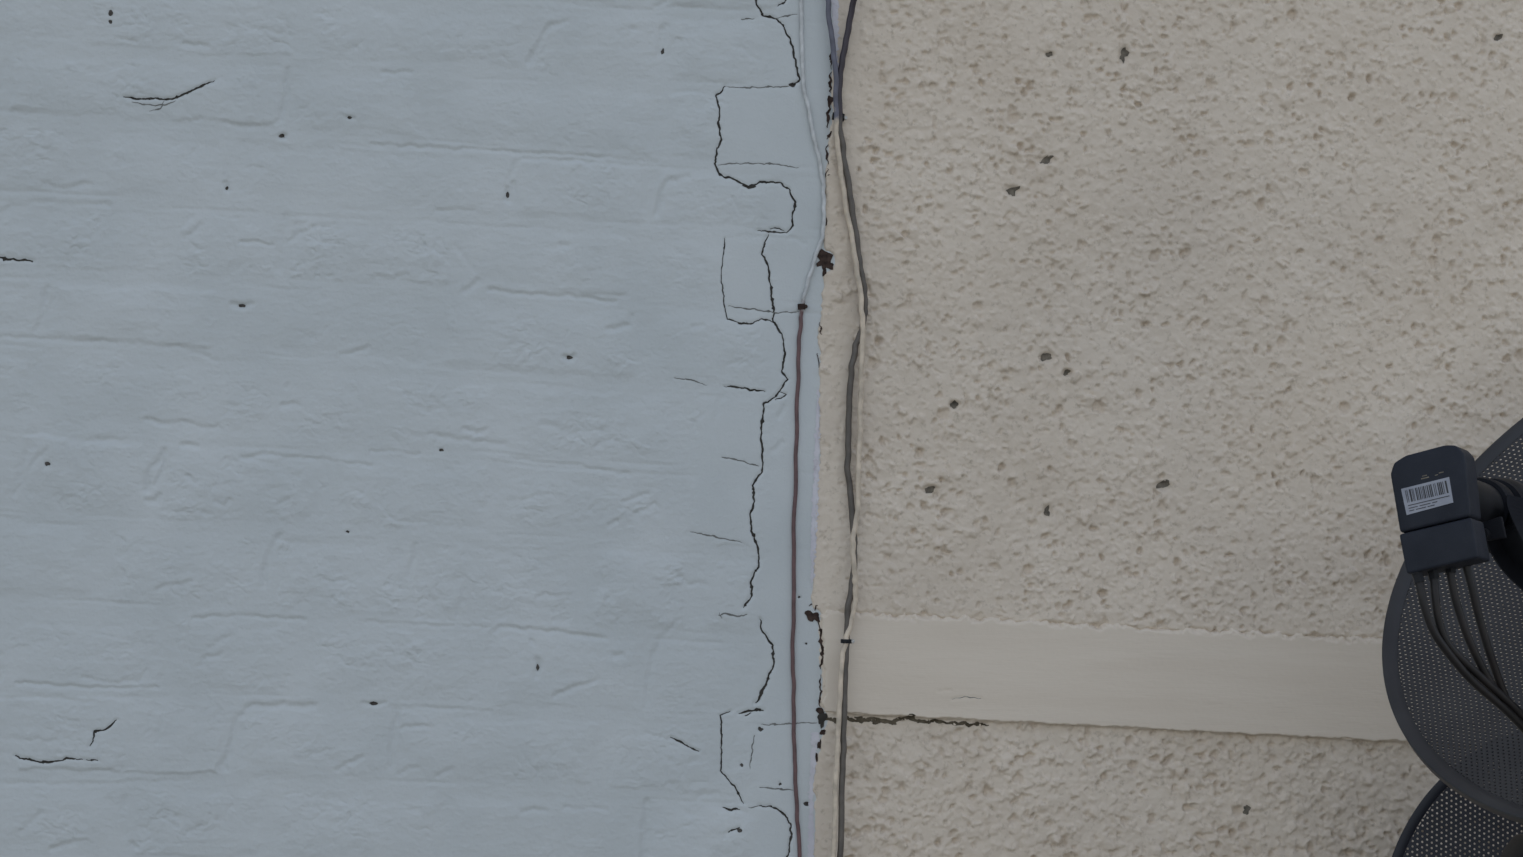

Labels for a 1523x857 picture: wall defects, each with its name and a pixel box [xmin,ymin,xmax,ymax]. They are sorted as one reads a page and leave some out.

crack [123,81,214,111]
peeling [825,0,840,178]
spalling [816,249,834,276]
spalling [798,596,828,762]
crack [15,720,116,764]